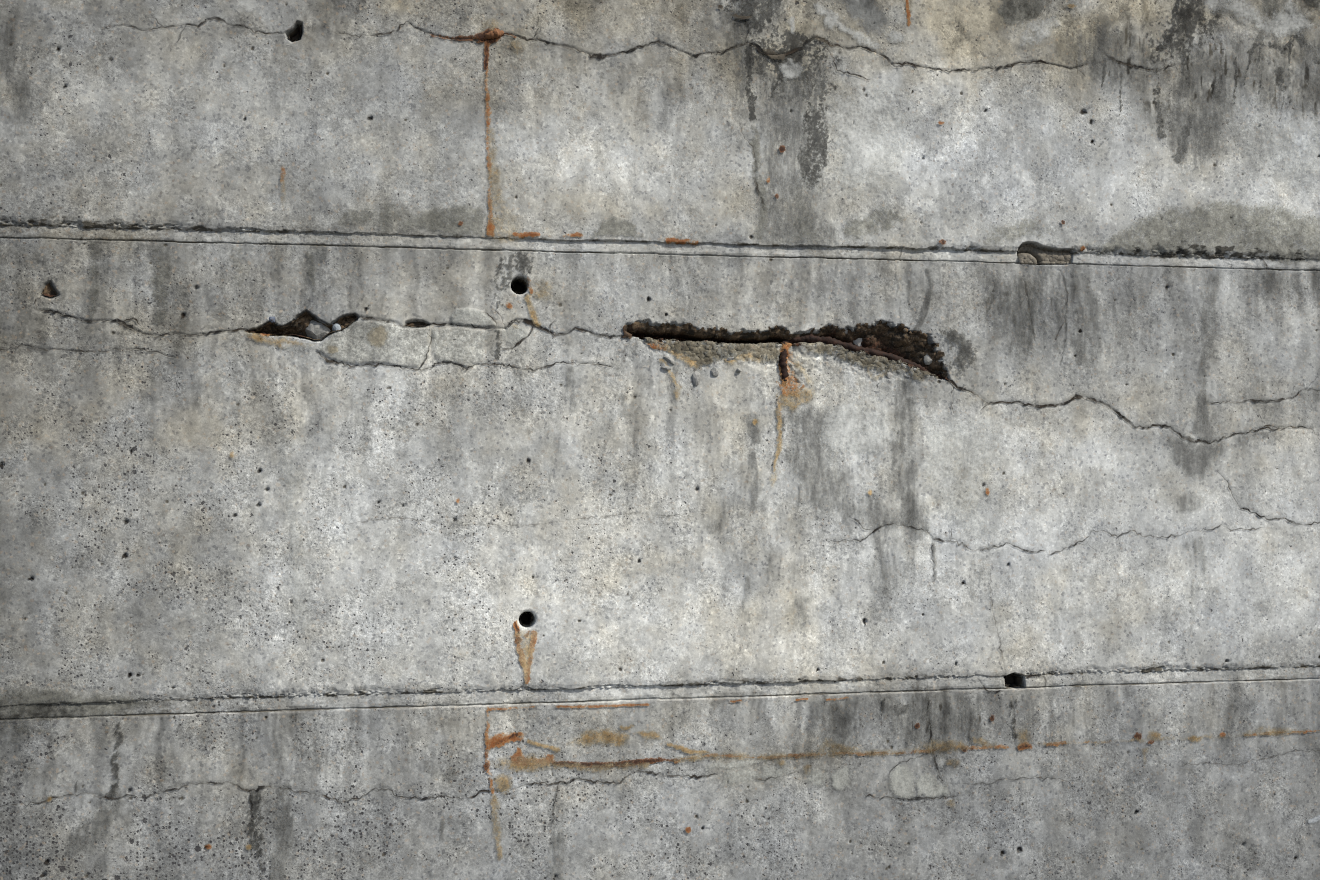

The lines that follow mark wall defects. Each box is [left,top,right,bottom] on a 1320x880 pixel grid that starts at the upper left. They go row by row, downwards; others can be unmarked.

corrosion [430,21,540,239]
crack [343,18,1172,80]
water stain [724,0,912,245]
water stain [1079,0,1320,170]
water stain [1092,201,1320,290]
peeling [247,307,493,365]
crack [318,310,623,372]
spalling [623,313,978,396]
crack [946,379,1319,444]
crack [831,481,1320,606]
corrosion [513,620,537,684]
corrosion [484,706,1067,858]